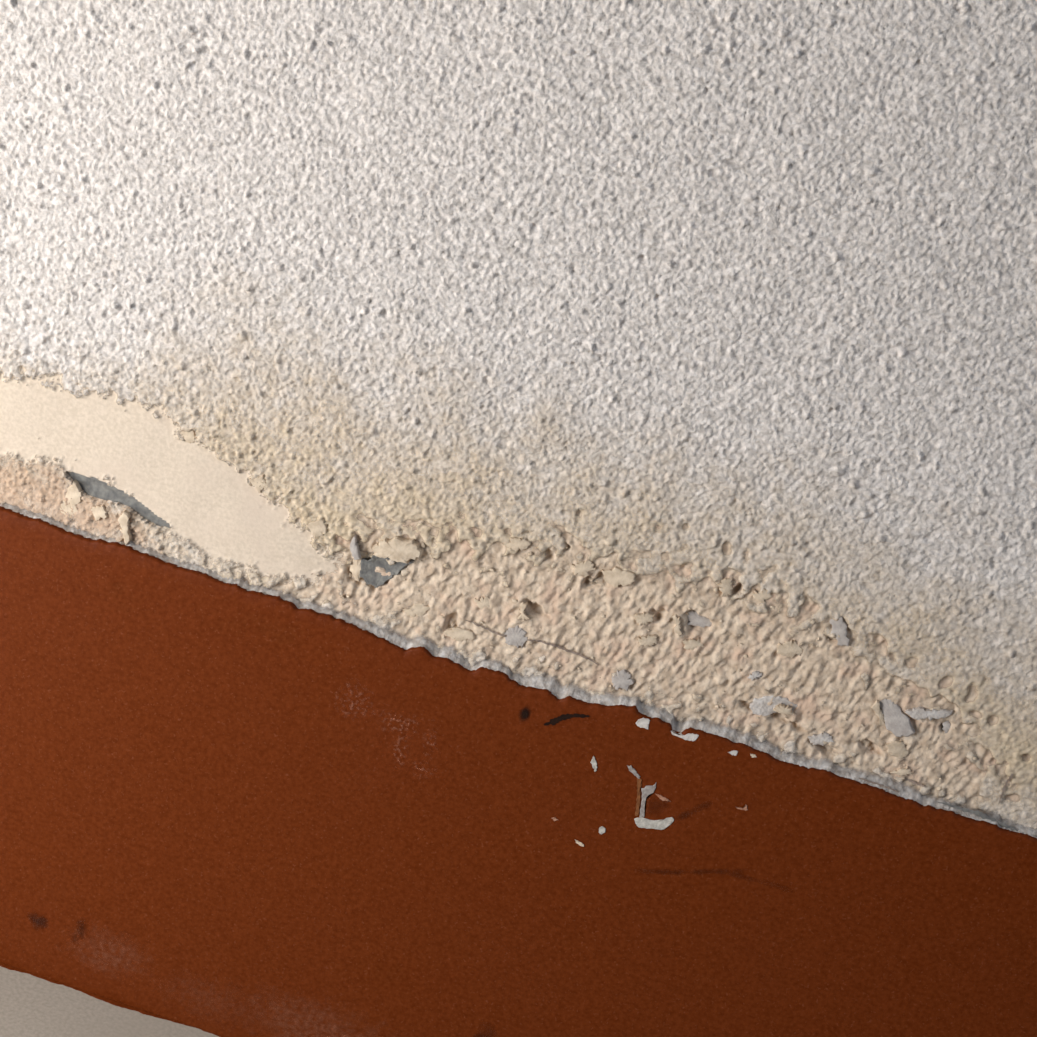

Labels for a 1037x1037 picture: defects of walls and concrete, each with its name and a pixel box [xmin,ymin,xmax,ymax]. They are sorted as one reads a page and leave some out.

flaking render [0,365,1019,813]
peeling [627,765,674,830]